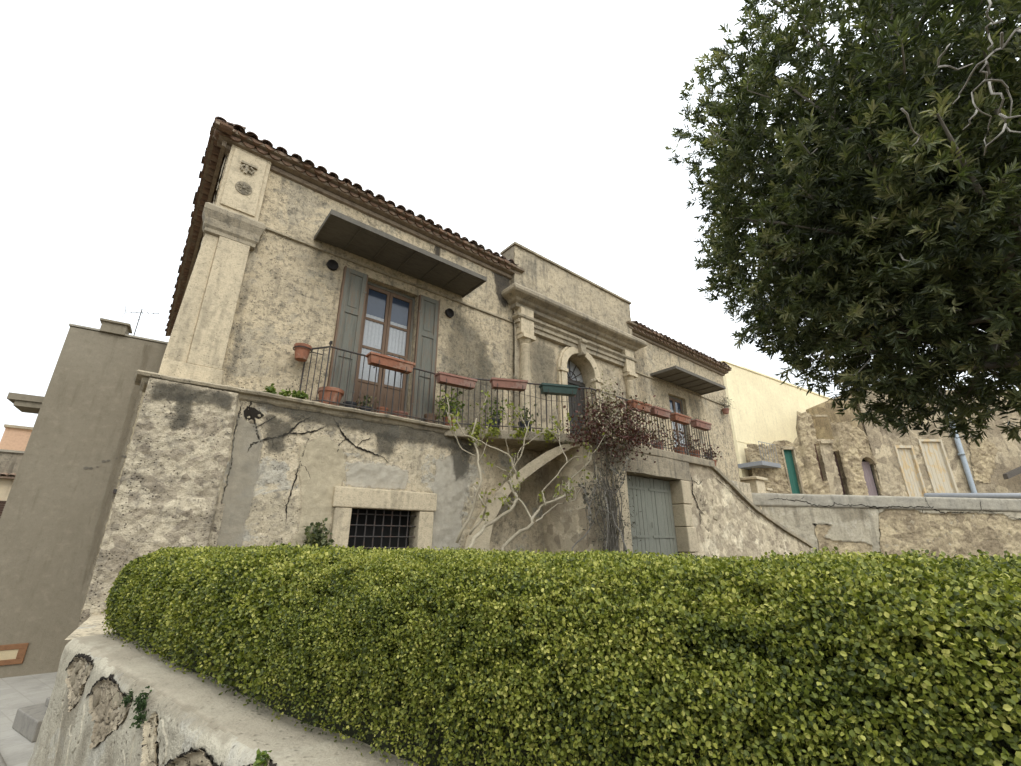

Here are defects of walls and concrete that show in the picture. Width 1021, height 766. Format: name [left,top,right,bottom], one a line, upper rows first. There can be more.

crack [220,401,387,534]
spalling [46,657,213,766]